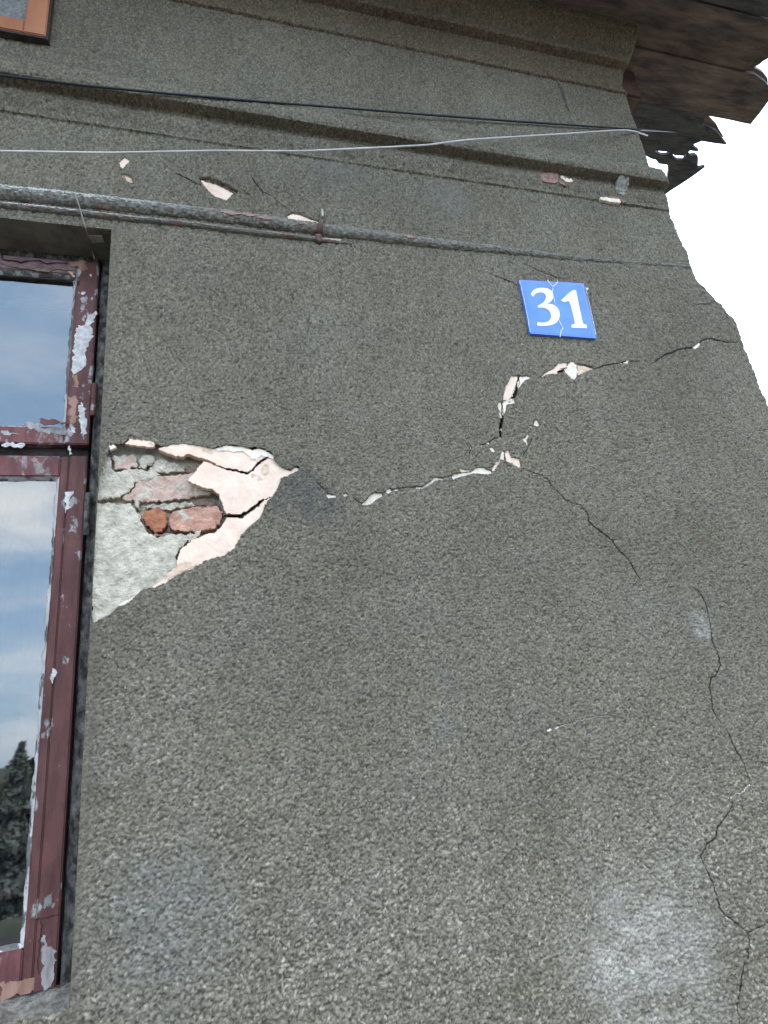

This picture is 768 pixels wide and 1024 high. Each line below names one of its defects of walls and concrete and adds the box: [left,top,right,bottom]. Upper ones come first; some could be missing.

spalling [119,158,133,185]
spalling [201,178,273,220]
spalling [287,213,324,225]
spalling [539,172,573,188]
spalling [599,175,630,205]
crack [595,338,739,369]
peeling [1,311,98,455]
crack [316,376,642,581]
peeling [64,491,74,513]
spalling [92,439,300,623]
crack [693,587,768,1024]
peeling [0,935,57,1002]